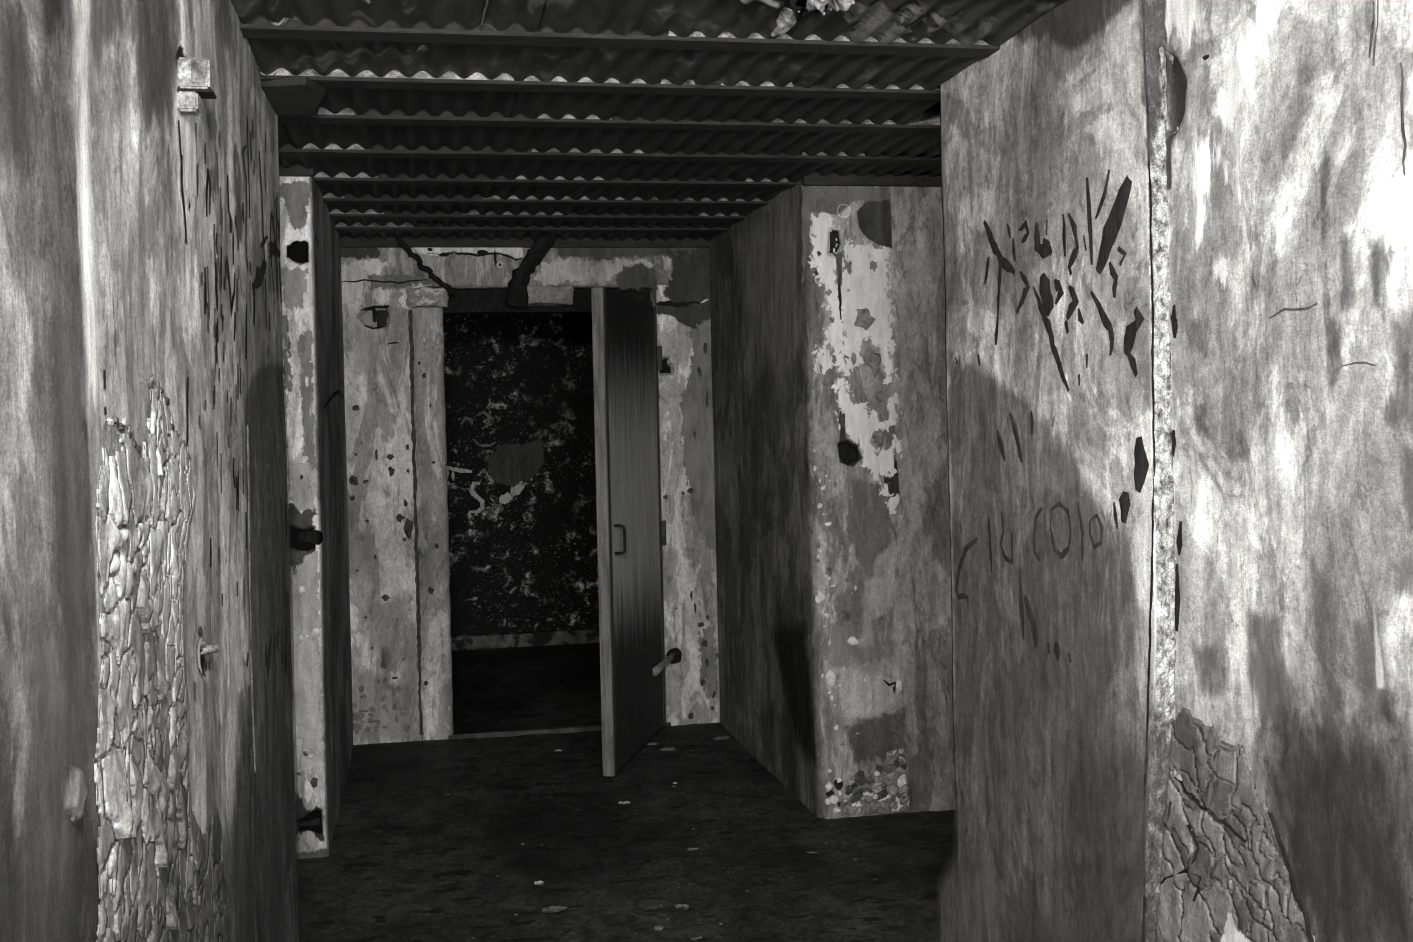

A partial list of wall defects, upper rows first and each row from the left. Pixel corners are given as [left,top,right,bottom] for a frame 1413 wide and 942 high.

crack [101,370,109,415]
crack [183,377,191,447]
peeling [181,115,325,842]
peeling [807,212,904,526]
peeling [815,542,859,745]